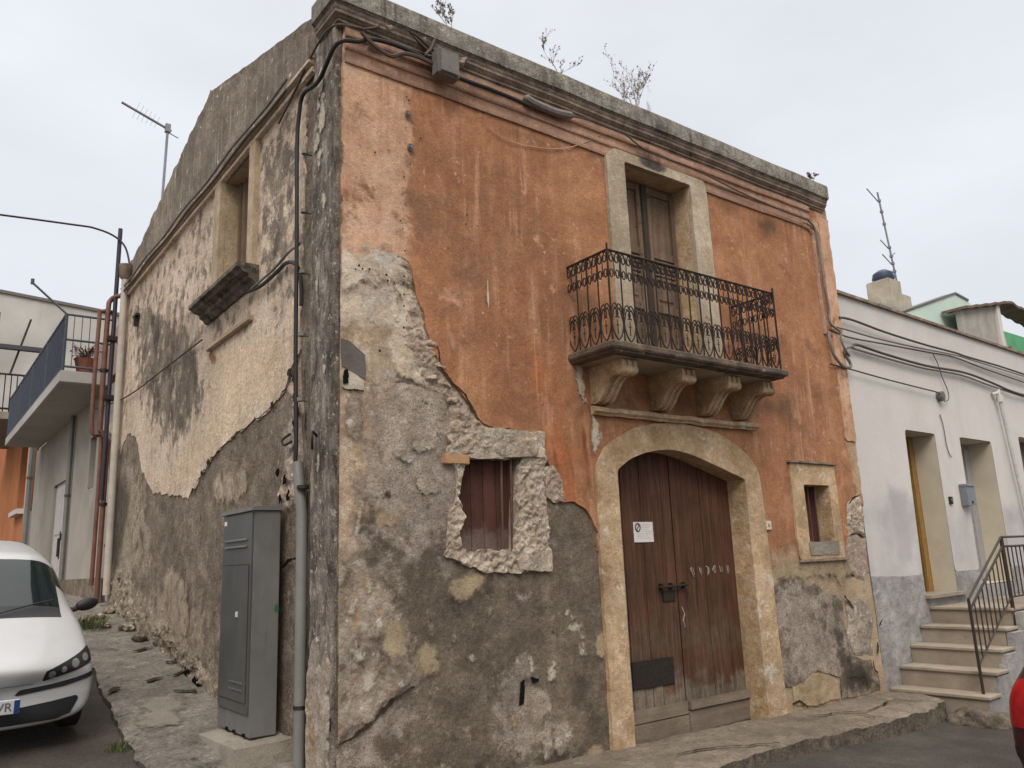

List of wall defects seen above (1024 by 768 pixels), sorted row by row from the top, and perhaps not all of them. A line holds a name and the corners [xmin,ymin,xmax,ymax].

peeling [314,67,325,171]
peeling [108,243,610,768]
peeling [771,494,887,713]